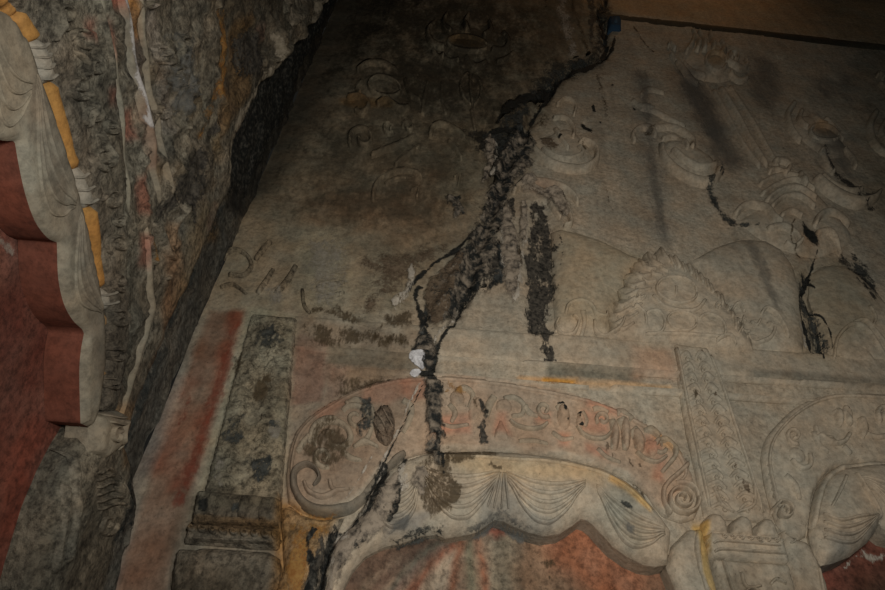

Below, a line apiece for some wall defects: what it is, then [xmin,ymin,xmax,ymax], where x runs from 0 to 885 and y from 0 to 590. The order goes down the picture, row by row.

leakage [463,0,613,176]
crack [490,0,654,143]
spalling [361,242,447,312]
spalling [368,311,446,465]
crack [367,229,489,500]
leakage [312,194,563,412]
spalling [423,130,571,326]
leakage [706,166,759,227]
leakage [839,253,877,299]